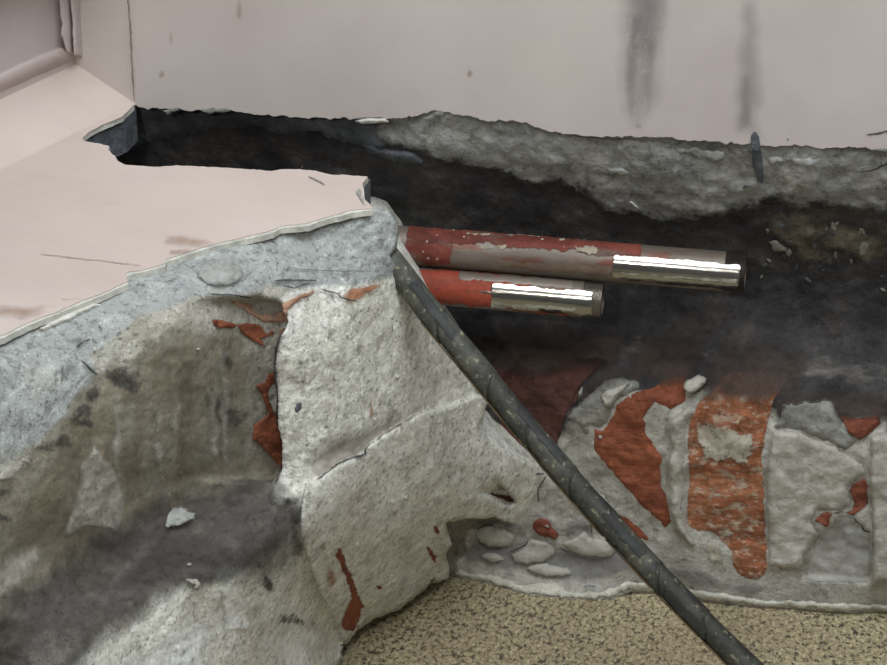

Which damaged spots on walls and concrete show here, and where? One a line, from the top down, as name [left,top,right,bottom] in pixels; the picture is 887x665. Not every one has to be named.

spalling [130,105,887,222]
crack [209,291,252,299]
crack [274,268,366,302]
rust [343,285,379,301]
damp [0,334,301,665]
flaking render [252,372,283,467]
crack [273,329,284,483]
flaking render [483,327,621,466]
flaking render [590,337,700,527]
flaking render [687,346,801,580]
damp [270,614,322,665]
rust [328,548,365,631]